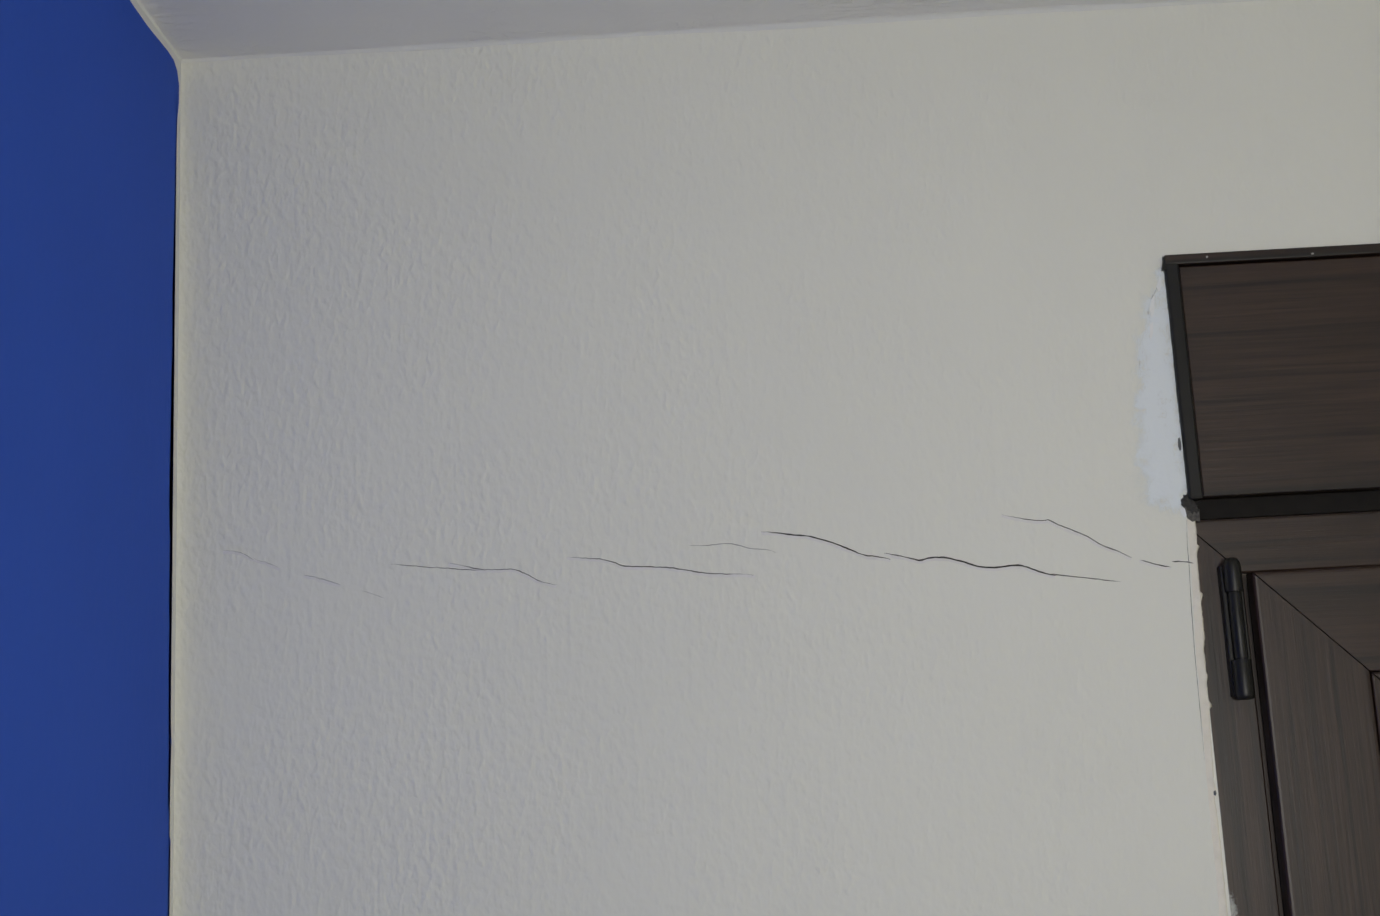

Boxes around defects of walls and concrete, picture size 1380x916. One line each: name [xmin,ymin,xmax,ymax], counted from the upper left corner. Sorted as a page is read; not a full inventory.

crack [396,515,1204,750]